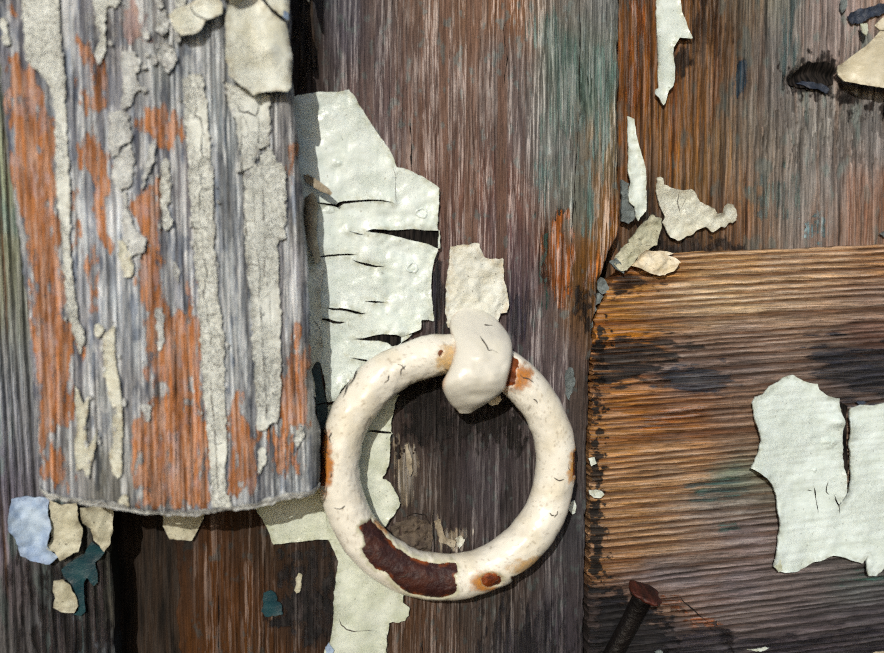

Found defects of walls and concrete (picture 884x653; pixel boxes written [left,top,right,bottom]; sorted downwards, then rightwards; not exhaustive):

peeling [654,0,693,105]
peeling [836,17,884,88]
peeling [609,116,737,274]
peeling [0,0,509,653]
corrosion [488,356,533,406]
peeling [750,375,884,576]
crack [808,402,848,514]
corrosion [359,519,458,598]
corrosion [472,558,538,591]